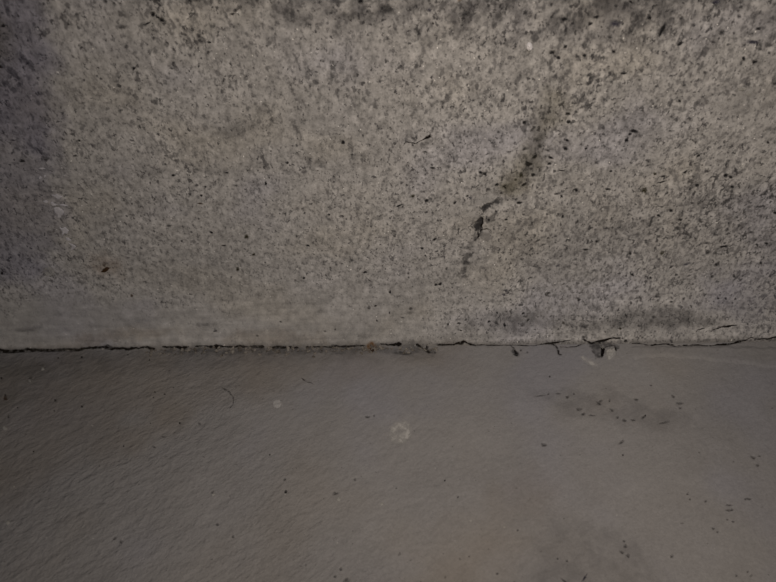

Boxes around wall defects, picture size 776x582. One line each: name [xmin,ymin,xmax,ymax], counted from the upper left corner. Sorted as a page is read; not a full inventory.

crack [0,325,776,355]